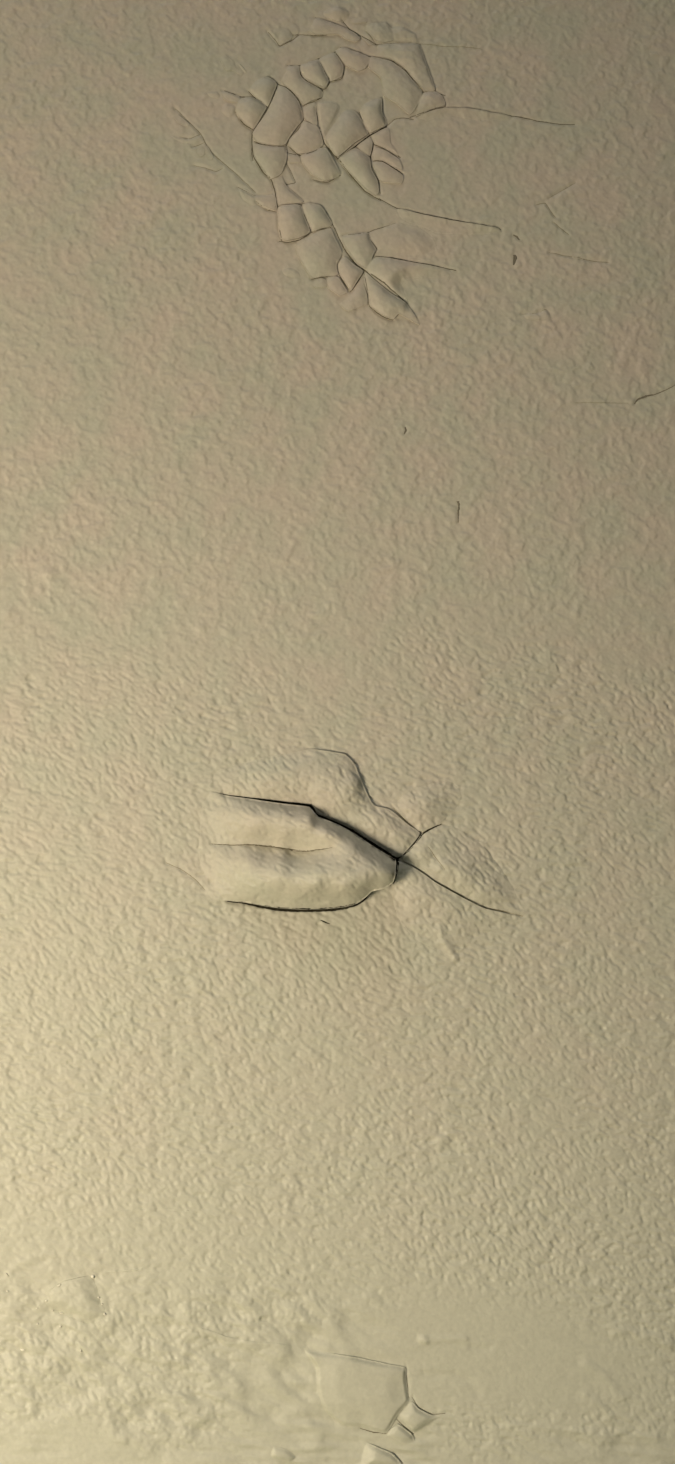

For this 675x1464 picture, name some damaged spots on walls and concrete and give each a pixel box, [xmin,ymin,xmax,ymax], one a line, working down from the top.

crack [171,111,256,193]
peeling [305,1350,445,1464]